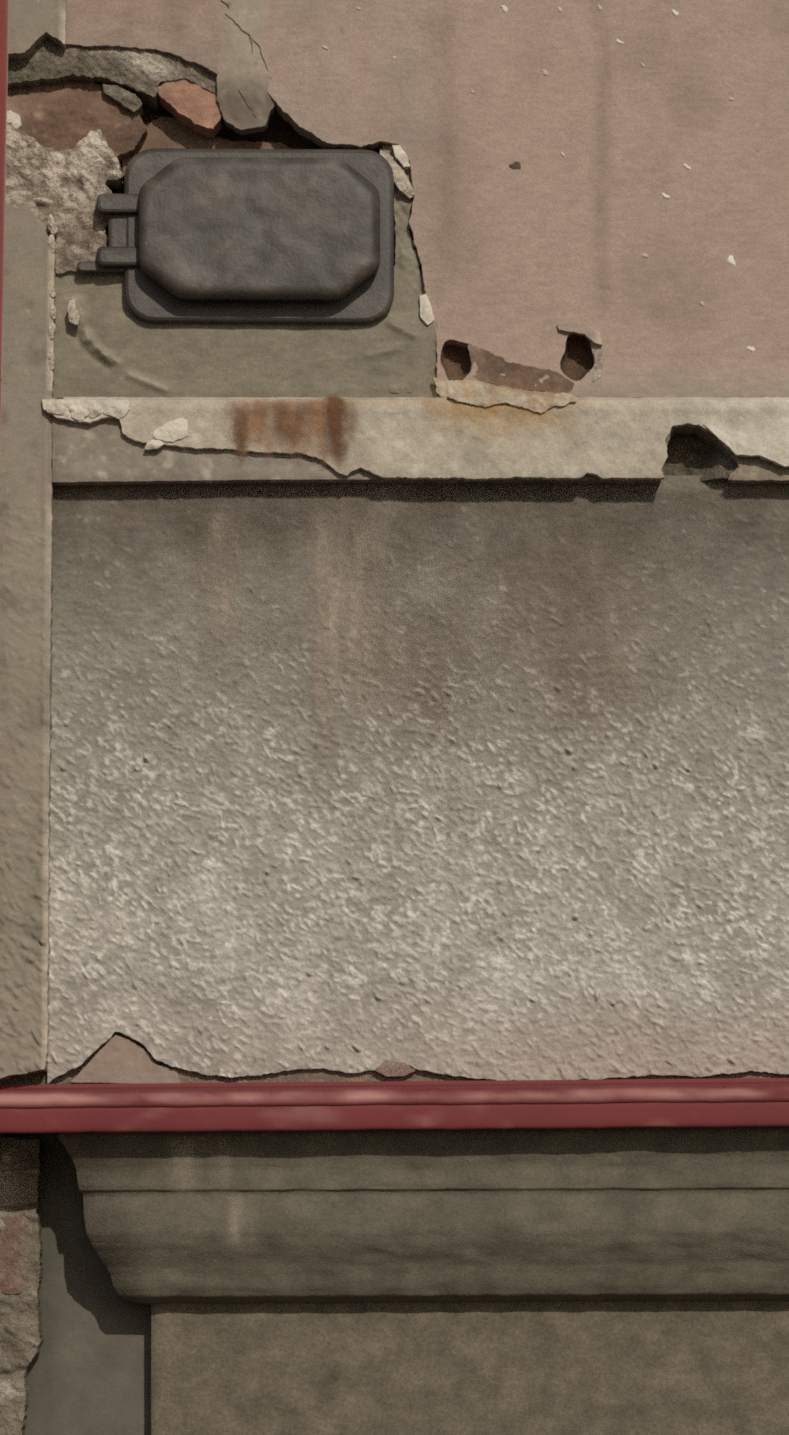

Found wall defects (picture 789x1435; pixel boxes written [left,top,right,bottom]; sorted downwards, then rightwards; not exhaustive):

flaking render [5,37,292,372]
flaking render [380,145,434,325]
spalling [386,344,578,414]
spalling [592,348,604,382]
peeling [46,397,378,485]
corrosion [236,394,345,458]
spalling [662,424,789,483]
spalling [71,1035,490,1084]
spalling [581,1071,789,1080]